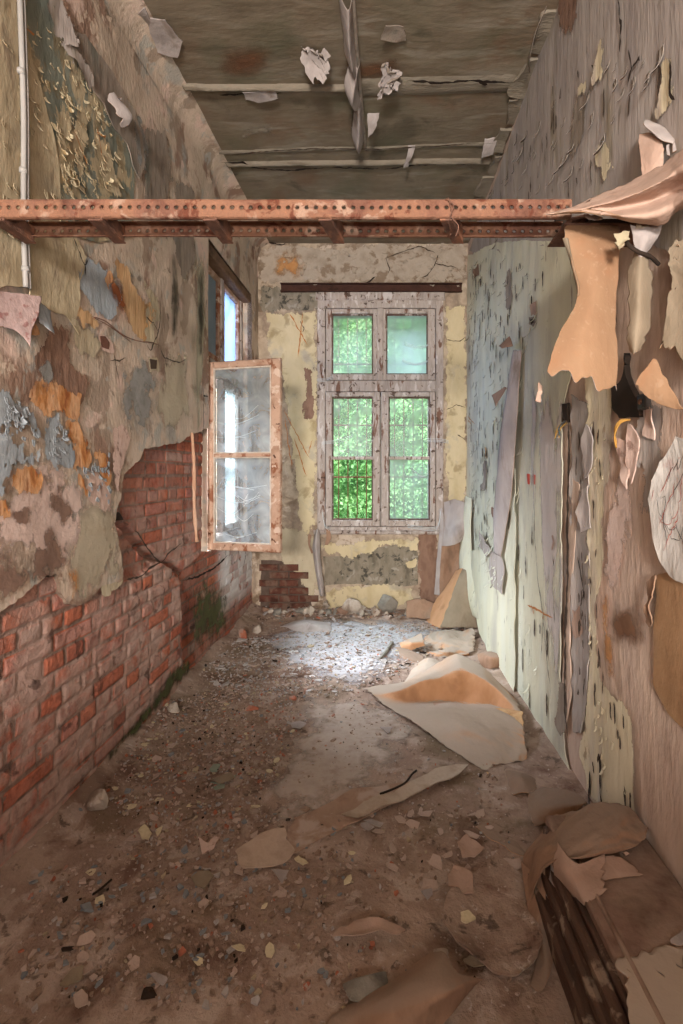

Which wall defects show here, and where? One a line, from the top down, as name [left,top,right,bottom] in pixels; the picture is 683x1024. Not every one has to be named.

crack [366,246,456,283]
peeling [258,0,683,811]
flaking render [0,0,438,868]
crack [127,531,180,580]
crack [187,555,228,580]